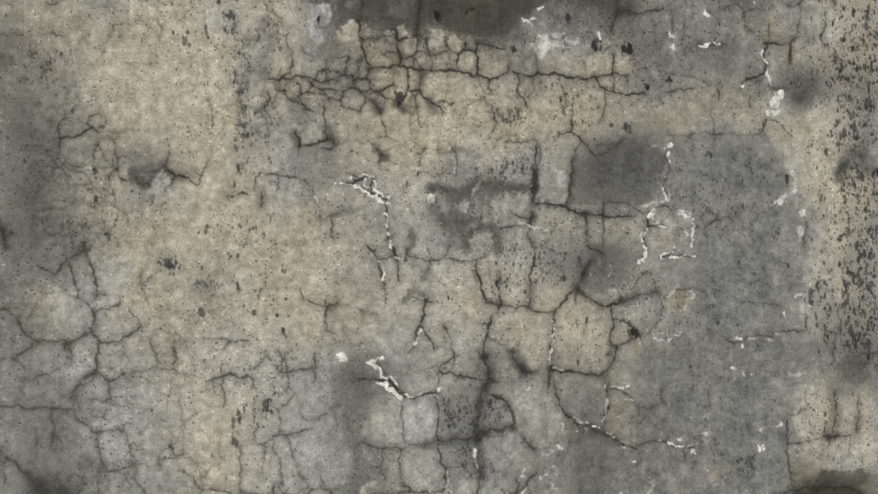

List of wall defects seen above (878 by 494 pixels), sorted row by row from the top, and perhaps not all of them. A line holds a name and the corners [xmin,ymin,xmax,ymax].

crack [20,98,215,223]
crack [0,223,270,494]
crack [101,0,190,66]
crack [156,0,793,494]
damp [287,0,878,494]